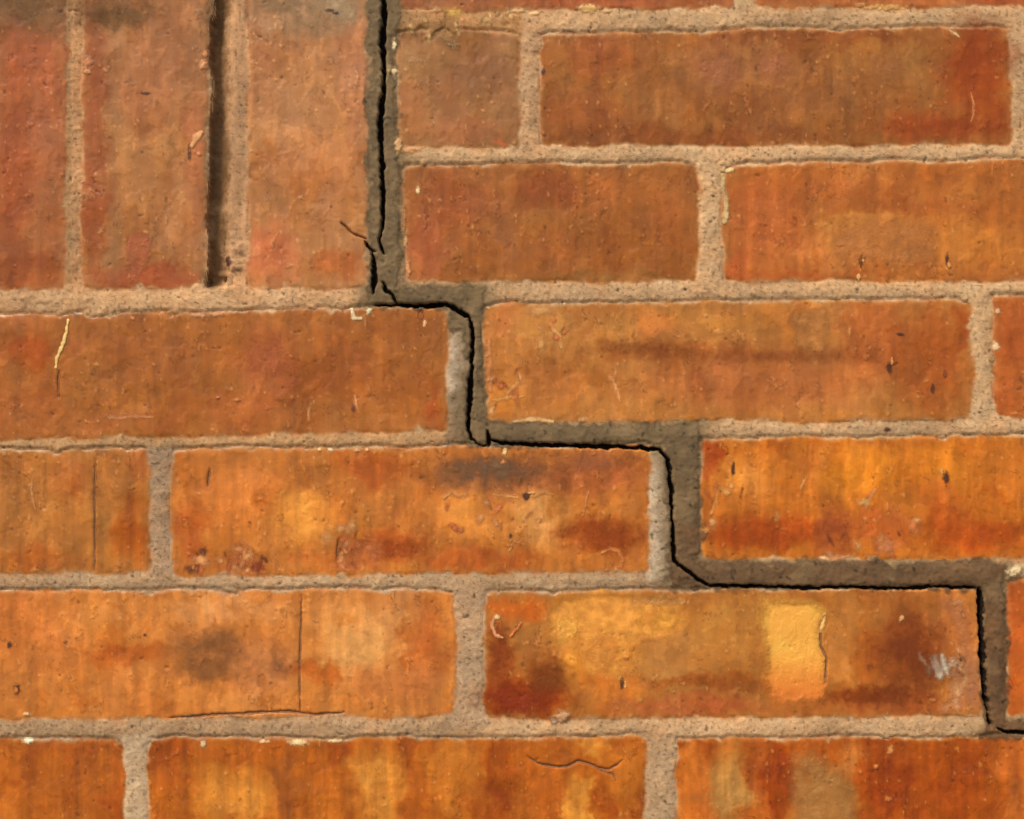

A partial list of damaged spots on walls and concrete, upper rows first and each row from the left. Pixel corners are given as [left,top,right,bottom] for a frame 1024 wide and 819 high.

crack [342,0,1024,734]
crack [171,595,344,718]
crack [527,756,622,781]